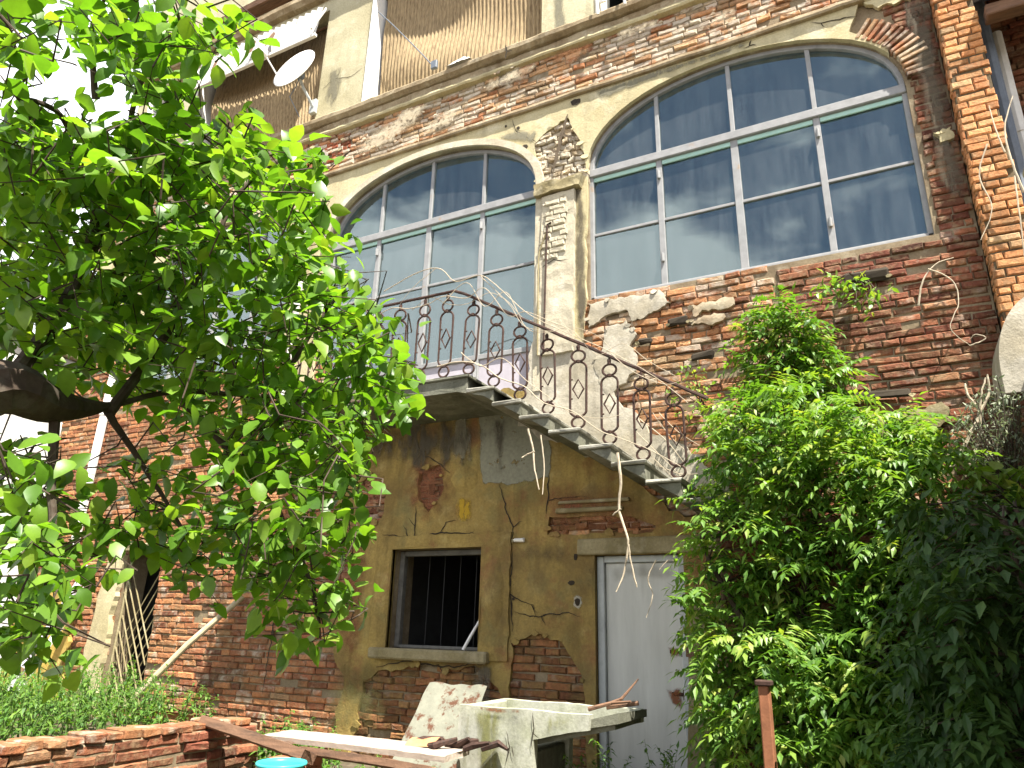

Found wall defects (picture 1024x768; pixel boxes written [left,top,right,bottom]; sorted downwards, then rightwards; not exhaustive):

flaking render [523,120,590,184]
flaking render [539,194,568,261]
flaking render [584,289,735,396]
water stain [371,419,471,467]
crack [388,506,473,537]
flaking render [542,498,654,537]
crack [499,485,579,631]
flaking render [352,630,585,747]
flaking render [351,751,394,759]